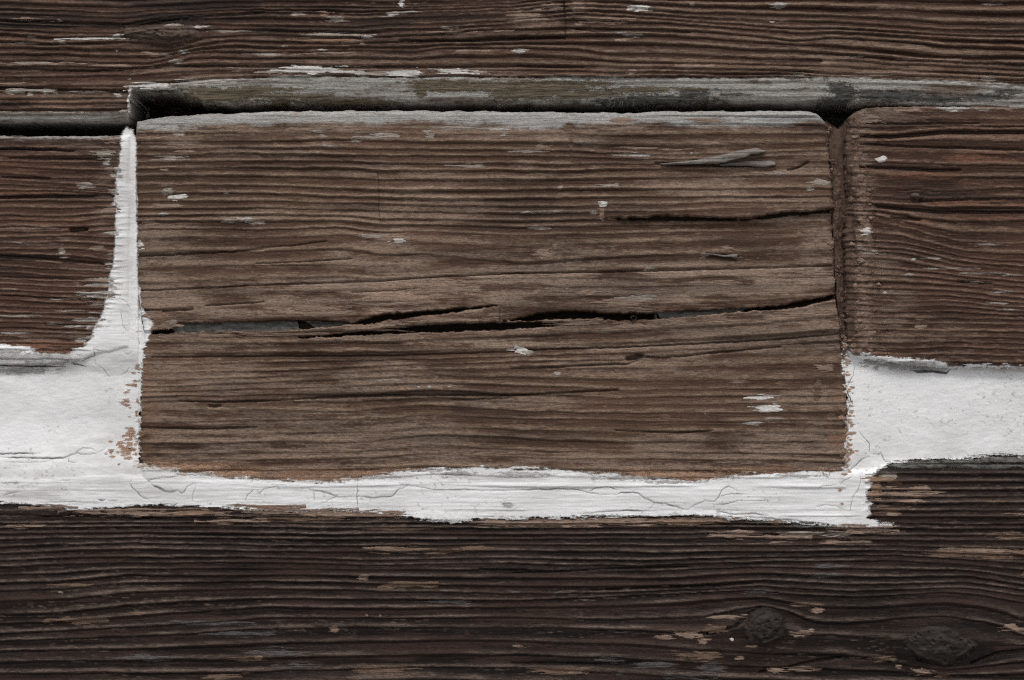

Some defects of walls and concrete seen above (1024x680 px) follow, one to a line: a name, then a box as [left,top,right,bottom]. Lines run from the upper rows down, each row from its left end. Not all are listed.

crack [614,209,833,221]
crack [154,285,262,334]
crack [743,296,832,311]
crack [297,309,837,368]
crack [0,452,94,483]
crack [309,483,470,506]
crack [529,487,639,514]